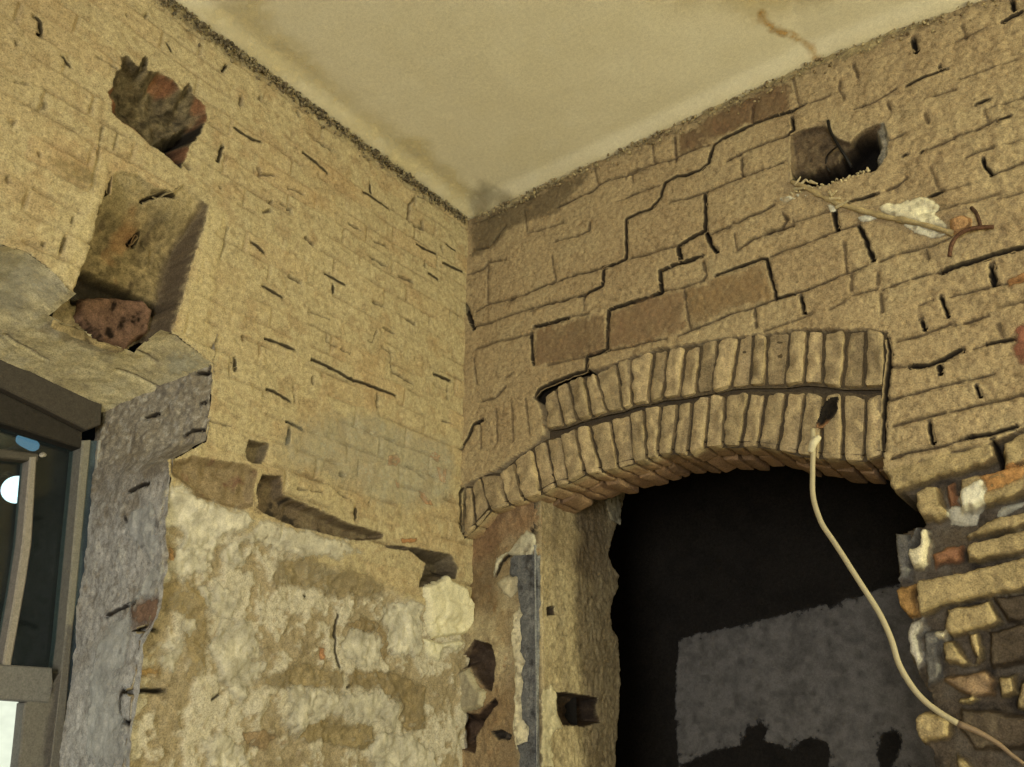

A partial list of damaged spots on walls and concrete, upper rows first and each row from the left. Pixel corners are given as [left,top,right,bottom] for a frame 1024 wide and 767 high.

spalling [106,52,209,170]
spalling [156,0,1001,225]
crack [529,104,807,399]
crack [831,192,877,262]
crack [466,304,477,330]
flaking render [947,463,1024,527]
flaking render [86,485,361,767]
flaking render [341,530,536,756]
flaking render [286,684,437,767]
spalling [540,685,602,767]